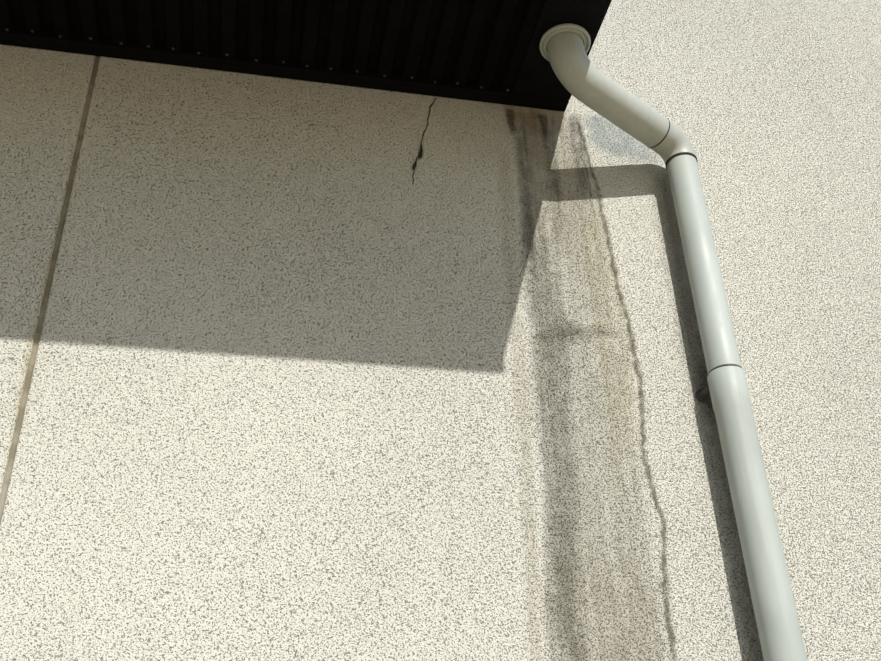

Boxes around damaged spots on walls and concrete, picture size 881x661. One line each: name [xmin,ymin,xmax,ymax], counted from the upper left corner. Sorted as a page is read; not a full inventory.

crack [412,99,436,183]
crack [579,124,646,443]
crack [647,463,666,523]
crack [662,556,674,645]